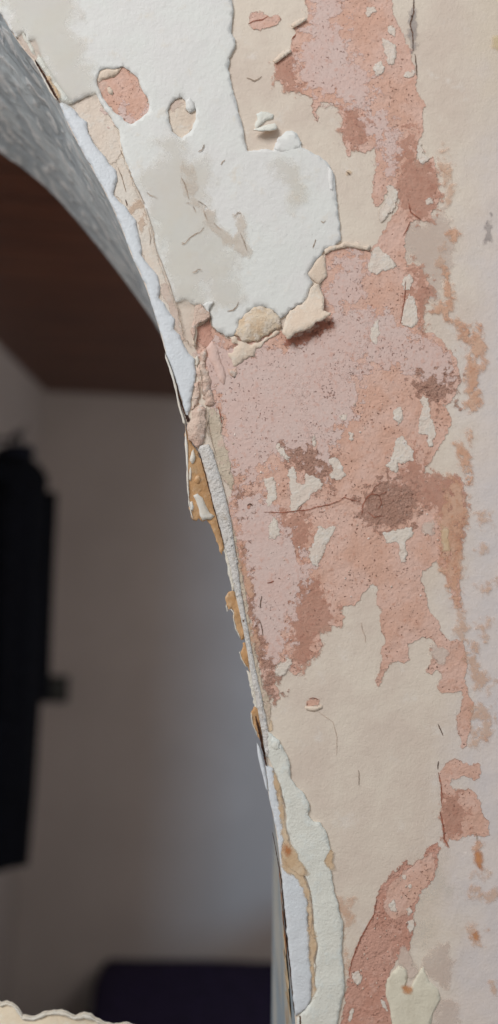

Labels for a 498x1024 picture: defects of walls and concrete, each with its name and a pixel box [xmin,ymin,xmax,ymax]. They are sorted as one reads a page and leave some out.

peeling [13,0,474,749]
crack [273,483,386,518]
peeling [340,758,490,1024]